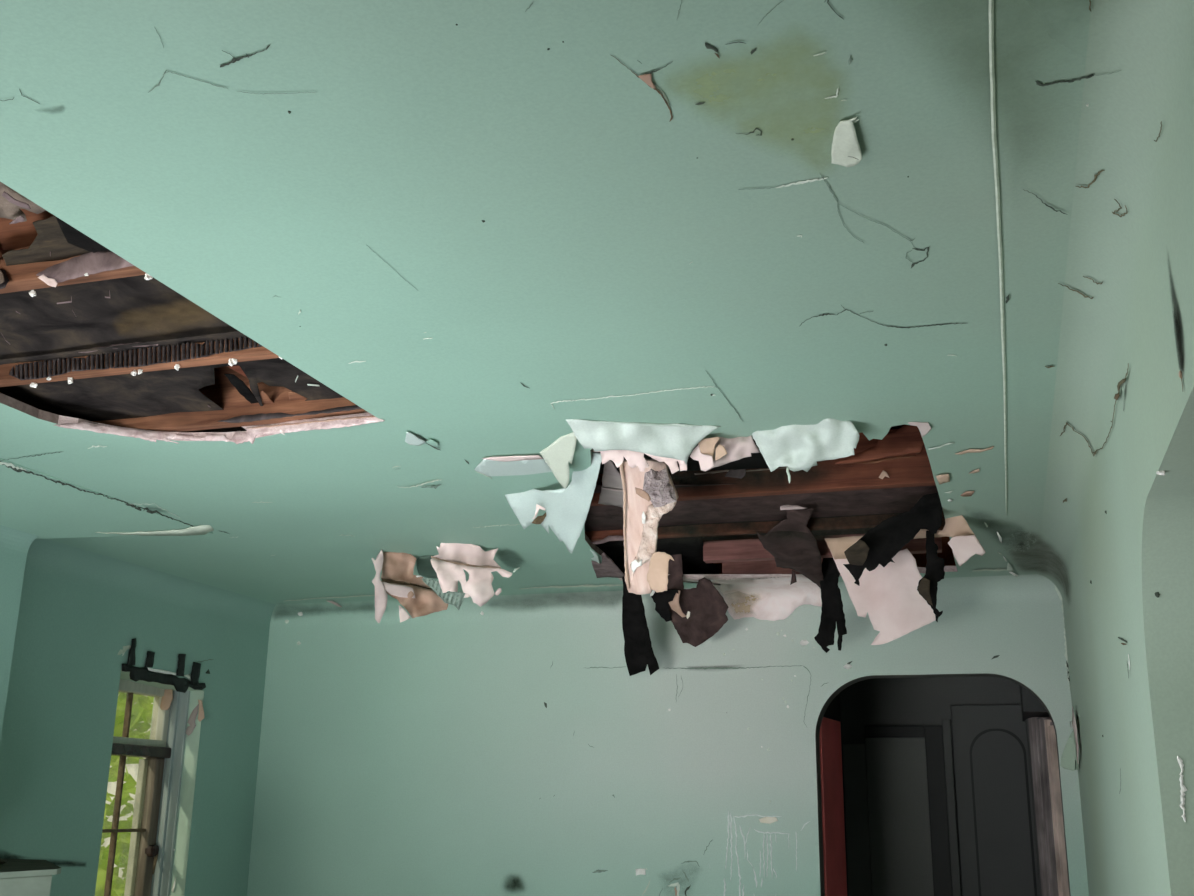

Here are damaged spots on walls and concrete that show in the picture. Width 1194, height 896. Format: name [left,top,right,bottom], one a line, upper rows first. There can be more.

crack [148,28,315,94]
crack [611,55,705,122]
peeling [831,116,862,167]
crack [739,175,929,268]
flaking render [53,413,385,444]
peeling [908,422,994,455]
crack [0,452,237,538]
peeling [474,419,860,554]
peeling [371,543,520,623]
peeling [590,550,625,580]
flaking render [668,574,822,621]
peeling [824,515,1018,645]